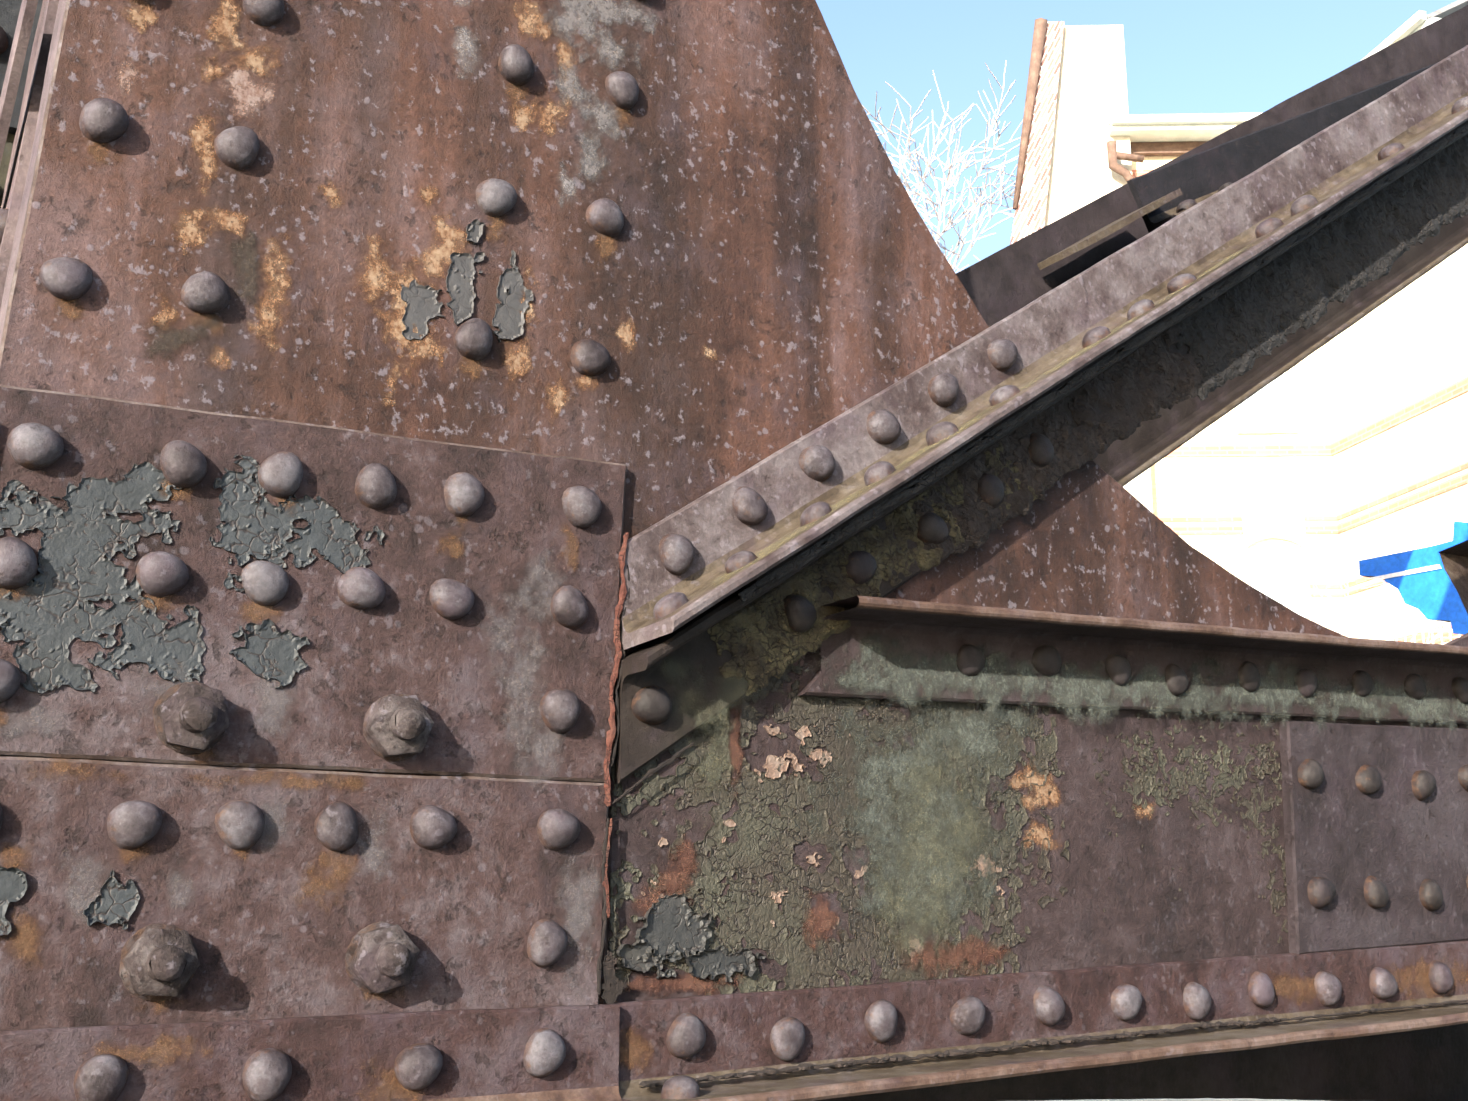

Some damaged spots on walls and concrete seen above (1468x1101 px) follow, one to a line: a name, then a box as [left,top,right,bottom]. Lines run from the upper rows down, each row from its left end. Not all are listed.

corrosion [127,0,158,34]
corrosion [202,0,280,81]
corrosion [174,116,248,252]
corrosion [249,238,291,348]
corrosion [359,186,480,406]
peeling [400,219,533,343]
corrosion [502,341,532,380]
peeling [0,462,206,694]
peeling [209,454,384,592]
peeling [608,632,1468,995]
peeling [0,866,27,936]
peeling [83,870,140,930]